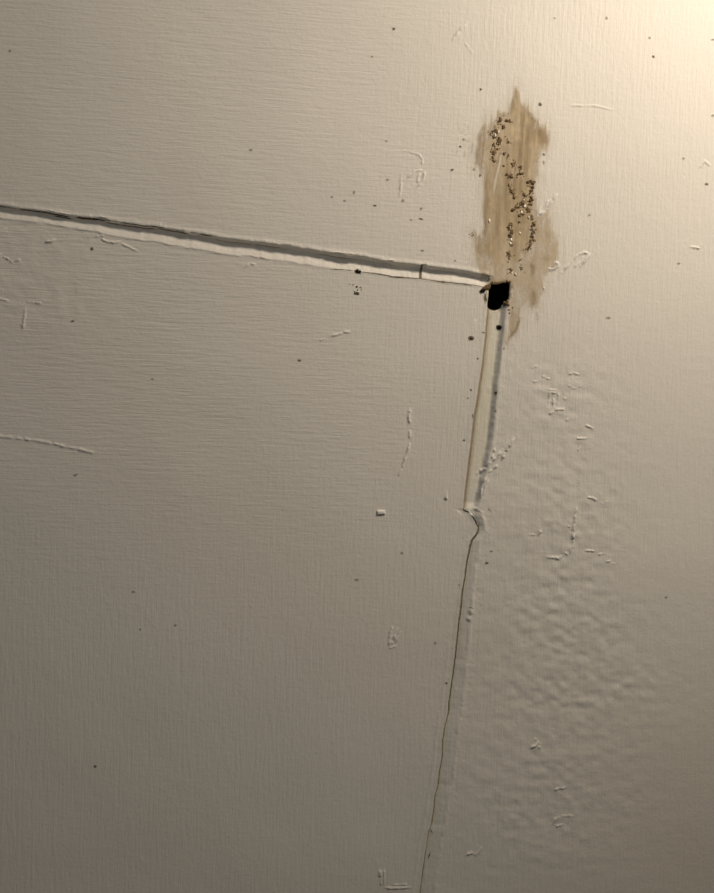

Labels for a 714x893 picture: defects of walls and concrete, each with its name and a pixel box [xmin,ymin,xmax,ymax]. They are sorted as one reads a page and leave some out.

spalling [484,280,510,310]
damp [471,92,560,336]
crack [0,195,517,893]